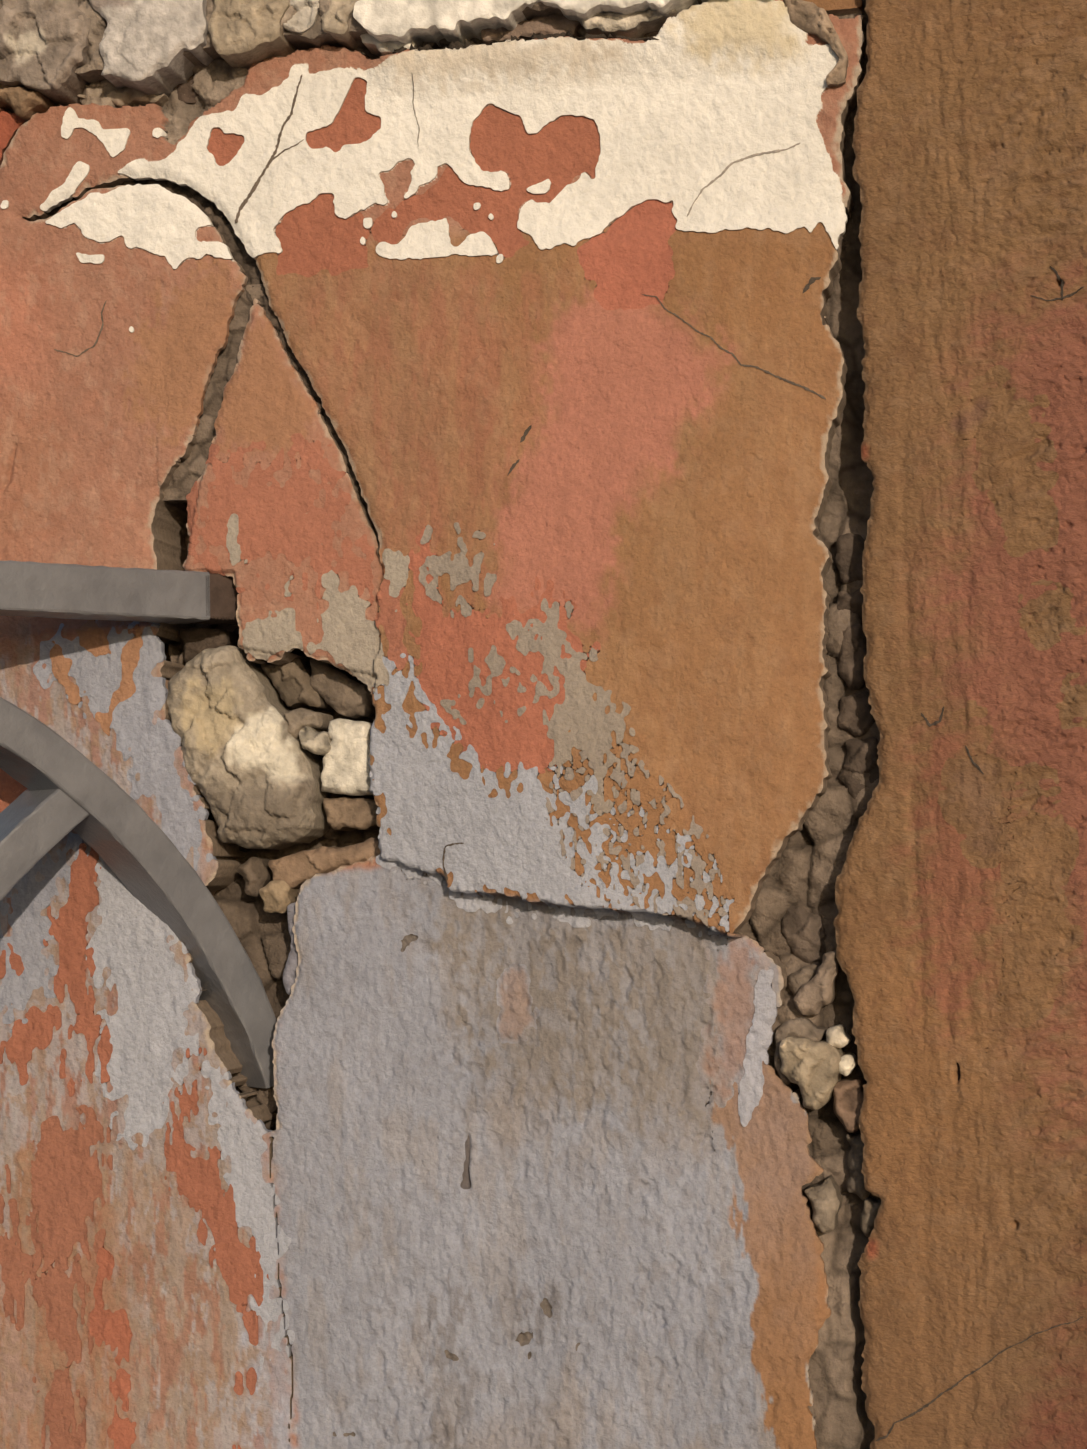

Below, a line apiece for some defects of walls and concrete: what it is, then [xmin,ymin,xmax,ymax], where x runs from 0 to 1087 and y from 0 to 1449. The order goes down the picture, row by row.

spalling [0,111,27,166]
crack [27,75,378,536]
peeling [40,16,848,311]
peeling [0,768,27,813]
peeling [33,620,217,871]
peeling [186,433,734,1020]
crack [642,0,1084,1449]
peeling [0,832,295,1449]
peeling [706,969,831,1449]